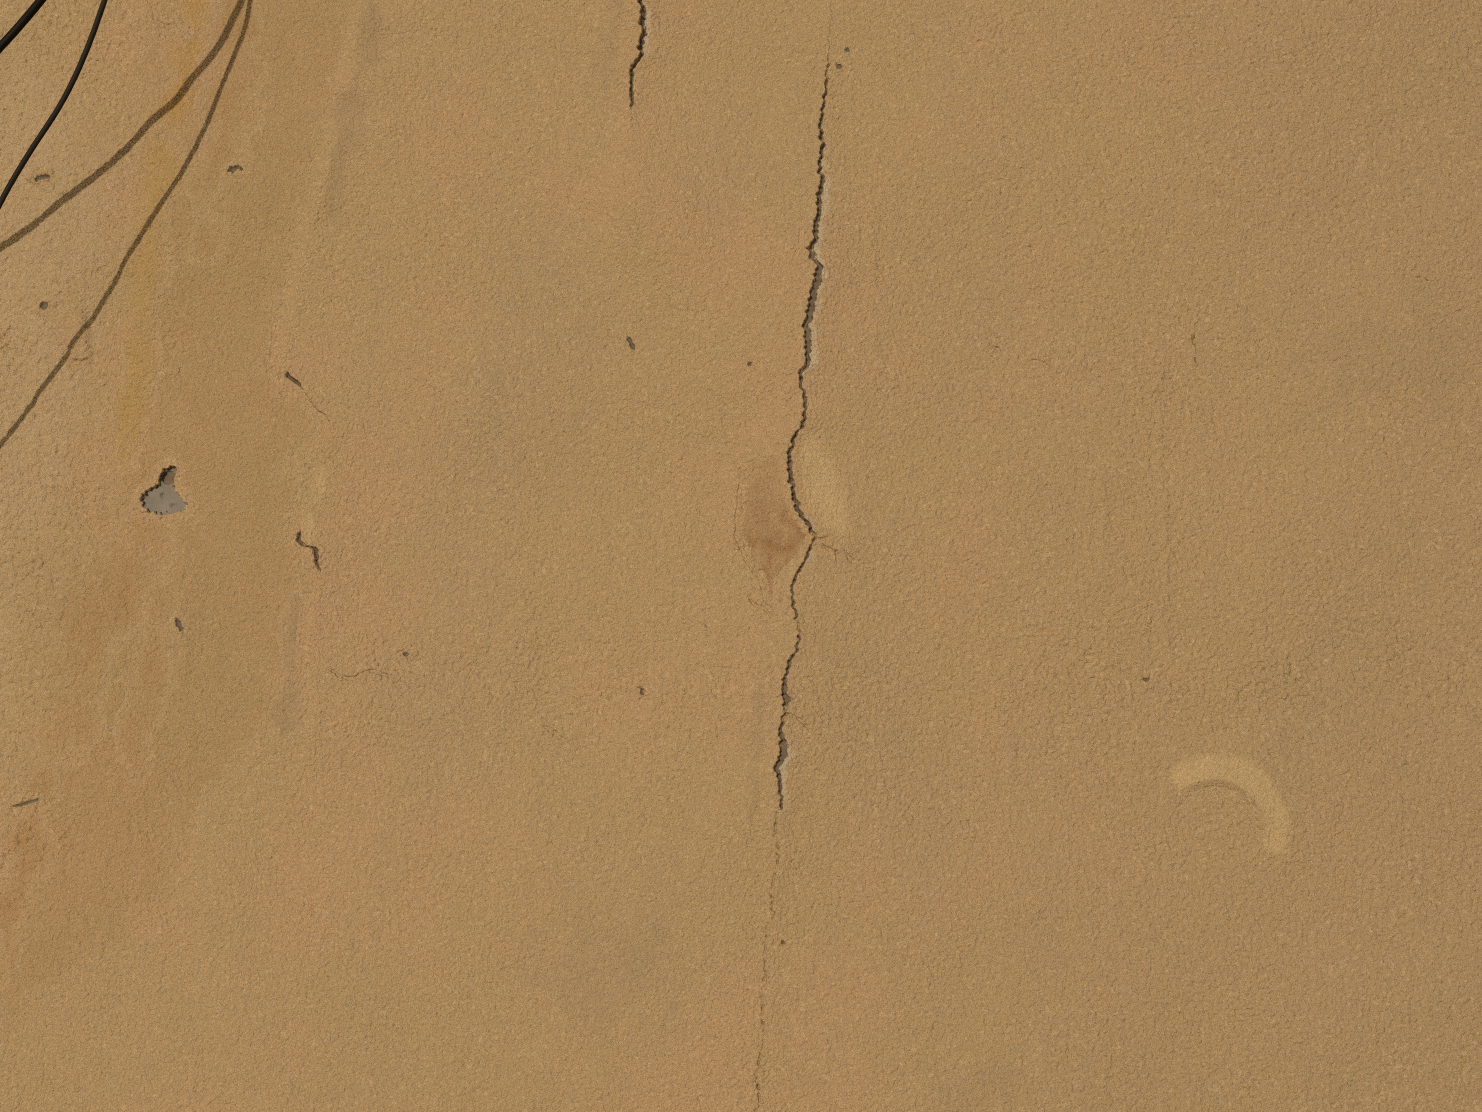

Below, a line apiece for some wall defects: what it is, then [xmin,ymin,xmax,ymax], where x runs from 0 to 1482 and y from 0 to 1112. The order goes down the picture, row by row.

crack [610,0,664,141]
spalling [130,455,198,525]
crack [726,10,872,1112]